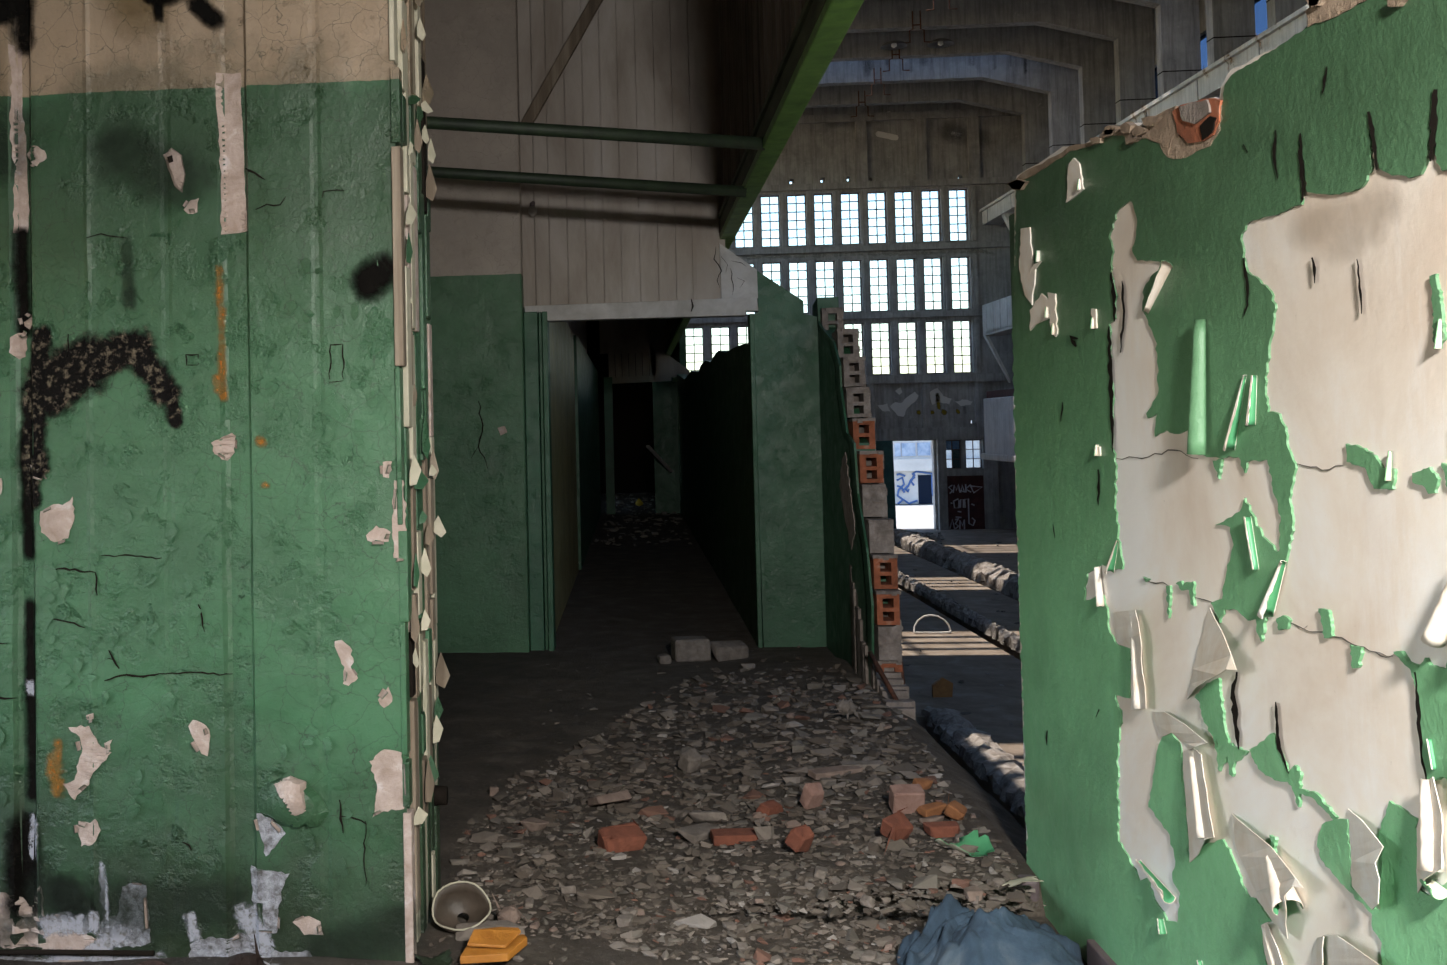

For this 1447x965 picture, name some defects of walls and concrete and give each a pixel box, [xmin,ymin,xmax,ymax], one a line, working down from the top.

spalling [8,44,47,232]
spalling [215,72,247,235]
corrosion [215,268,227,401]
spalling [39,497,75,545]
peeling [1007,0,1447,965]
crack [1296,463,1343,471]
spalling [366,416,450,825]
corrosion [47,741,63,795]
spalling [63,713,113,800]
spalling [188,720,210,756]
spalling [0,882,157,962]
spalling [189,813,323,957]